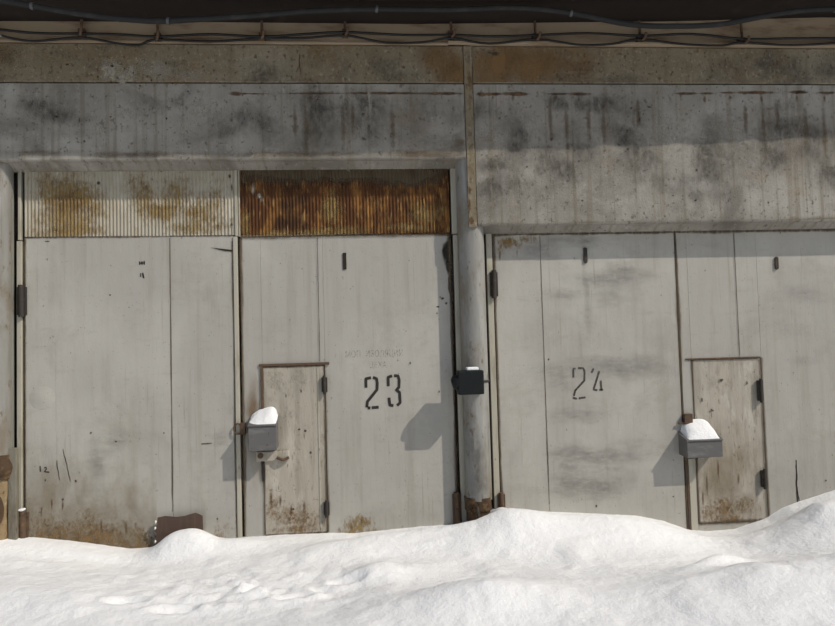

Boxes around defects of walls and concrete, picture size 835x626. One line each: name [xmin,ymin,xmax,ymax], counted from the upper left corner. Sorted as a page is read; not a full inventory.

corrosion [37,174,105,237]
corrosion [130,174,223,234]
corrosion [239,169,450,236]
corrosion [36,509,153,548]
corrosion [267,495,315,533]